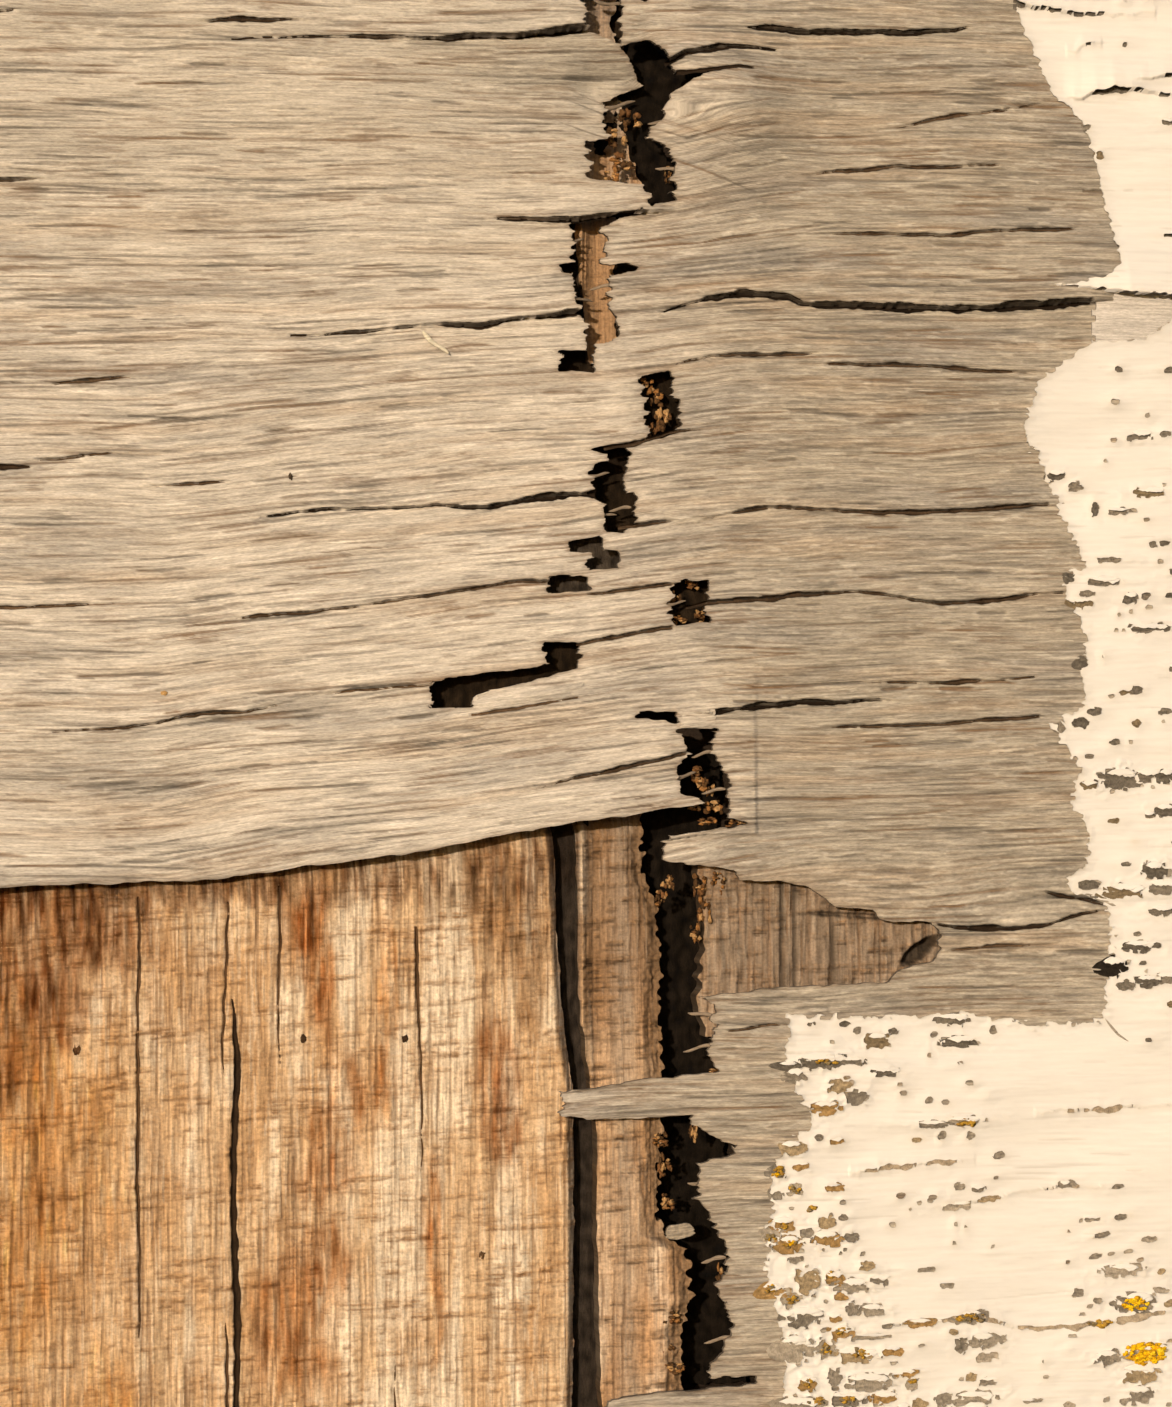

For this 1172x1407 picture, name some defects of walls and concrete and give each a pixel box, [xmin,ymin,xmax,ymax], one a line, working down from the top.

crack [211,0,967,373]
crack [242,352,1063,716]
crack [221,902,242,1407]
crack [550,820,598,1407]
crack [536,750,788,1078]
crack [654,1115,746,1385]
peeling [769,1021,901,1117]
peeling [753,1134,1093,1407]
peeling [1072,1214,1172,1325]
peeling [1078,861,1172,916]
peeling [1080,754,1172,791]
peeling [1092,931,1172,991]